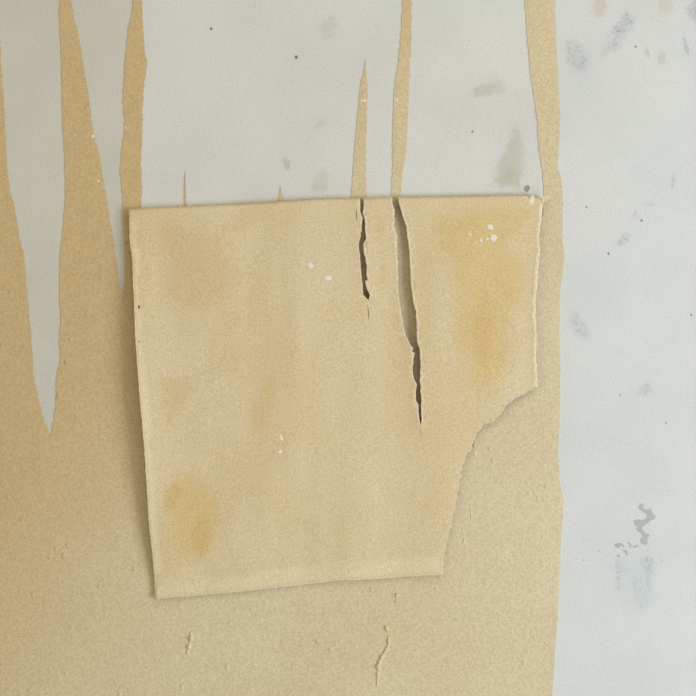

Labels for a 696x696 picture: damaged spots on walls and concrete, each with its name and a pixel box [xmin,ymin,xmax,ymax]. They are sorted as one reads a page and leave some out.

peeling [71,0,550,599]